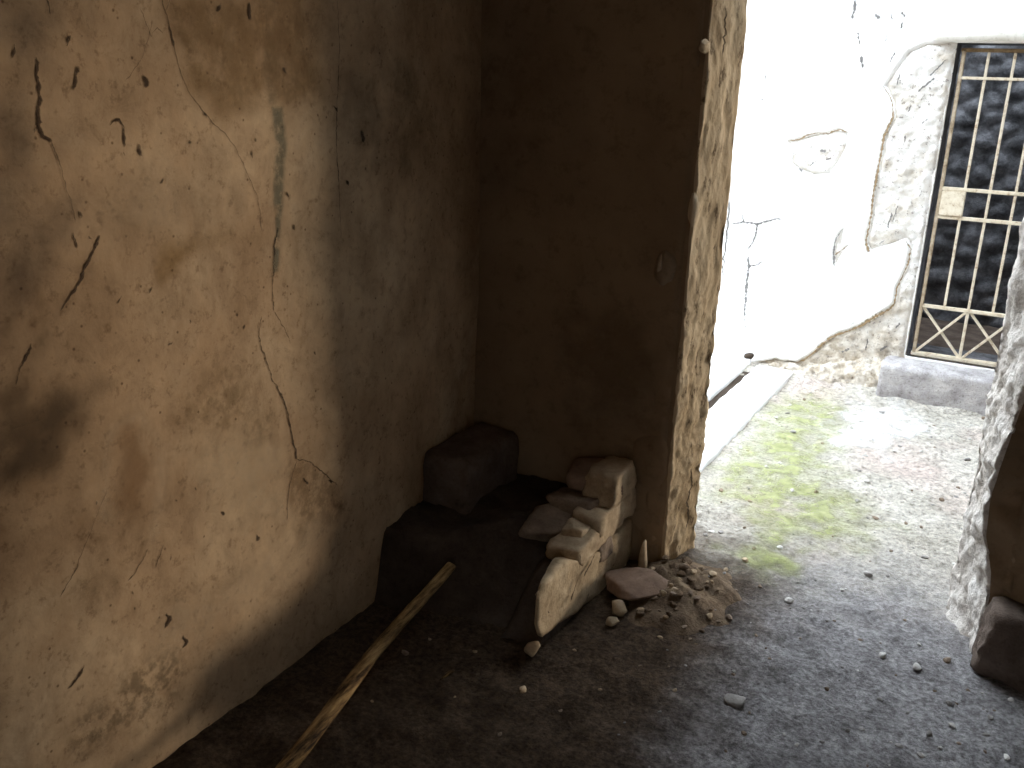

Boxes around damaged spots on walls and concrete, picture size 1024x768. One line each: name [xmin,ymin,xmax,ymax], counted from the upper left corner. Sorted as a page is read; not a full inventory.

crack [35,59,100,309]
crack [143,0,335,518]
water stain [274,109,285,237]
crack [722,201,781,328]
flaking render [768,43,958,366]